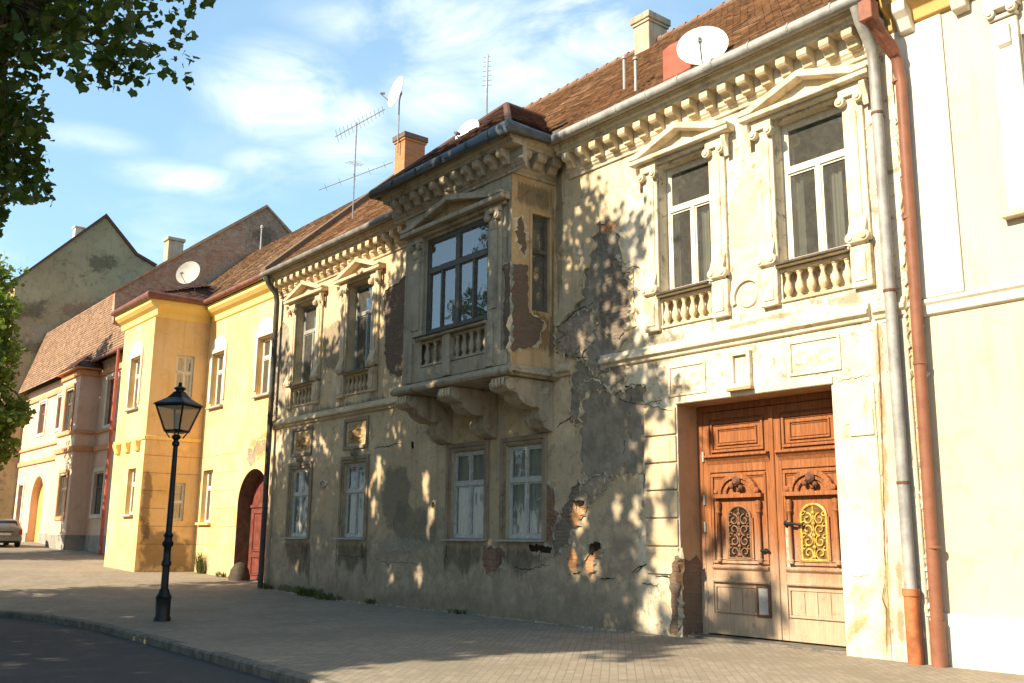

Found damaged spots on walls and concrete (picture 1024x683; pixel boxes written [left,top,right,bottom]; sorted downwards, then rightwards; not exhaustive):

flaking render [382,274,405,380]
crack [632,266,645,321]
flaking render [247,437,266,467]
flaking render [501,214,652,577]
crack [609,384,672,490]
crack [601,564,669,586]
flaking render [668,548,704,637]